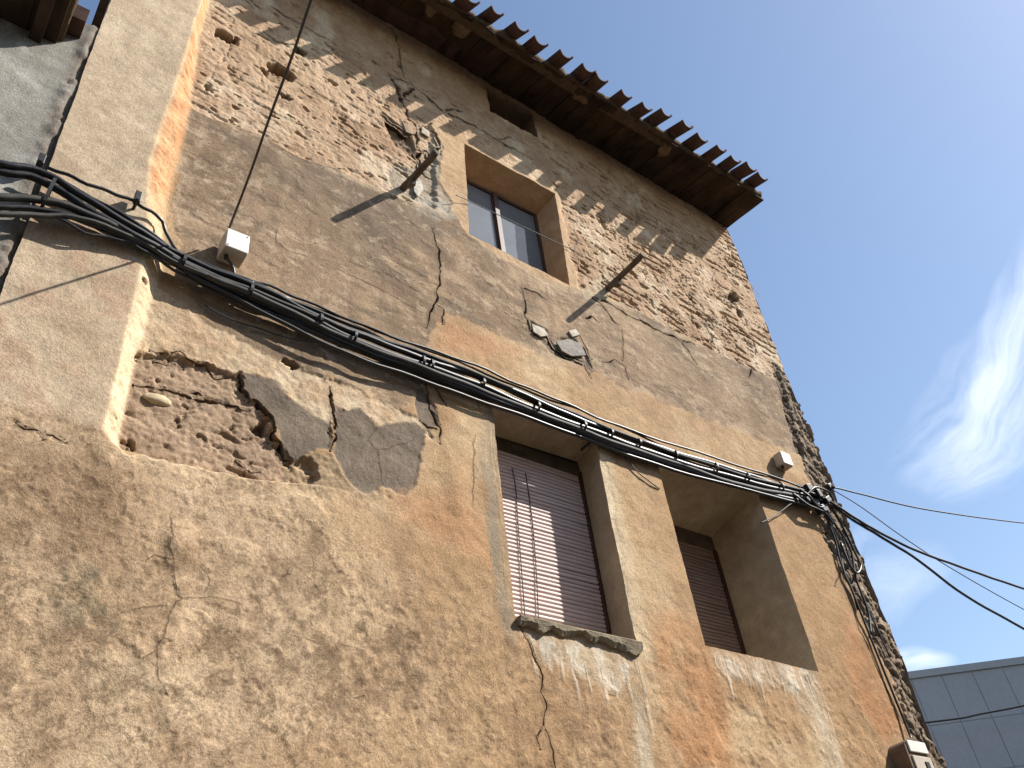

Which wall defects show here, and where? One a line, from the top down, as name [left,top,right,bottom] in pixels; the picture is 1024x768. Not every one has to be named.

peeling [182,0,457,205]
crack [275,228,447,329]
peeling [113,347,318,484]
crack [325,387,340,452]
crack [368,377,449,485]
peeling [509,96,947,768]
water stain [477,406,659,768]
crack [518,626,558,768]